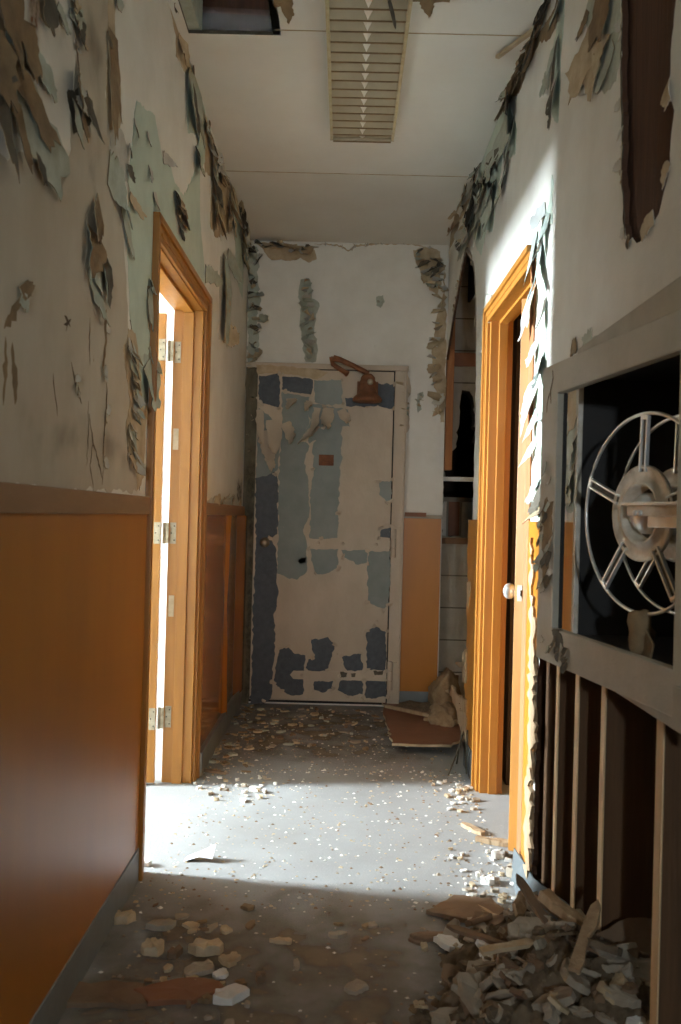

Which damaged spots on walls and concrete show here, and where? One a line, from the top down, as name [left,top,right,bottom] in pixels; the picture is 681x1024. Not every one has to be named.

peeling [0,0,621,704]